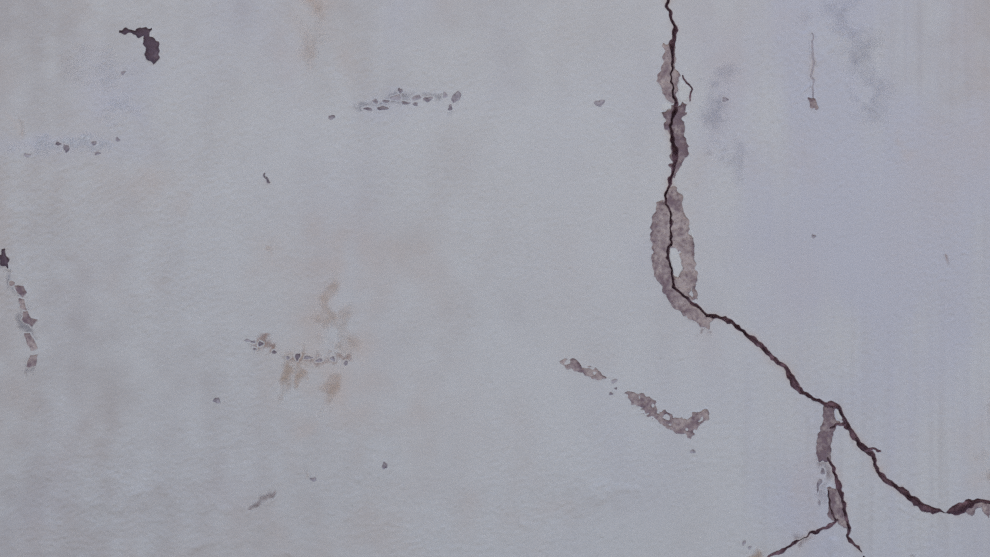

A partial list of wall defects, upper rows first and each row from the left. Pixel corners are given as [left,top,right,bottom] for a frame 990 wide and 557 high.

peeling [119,27,160,64]
flaking render [650,43,713,330]
peeling [0,248,9,269]
crack [664,0,990,516]
peeling [9,281,38,368]
peeling [559,358,709,453]
crack [767,457,862,557]